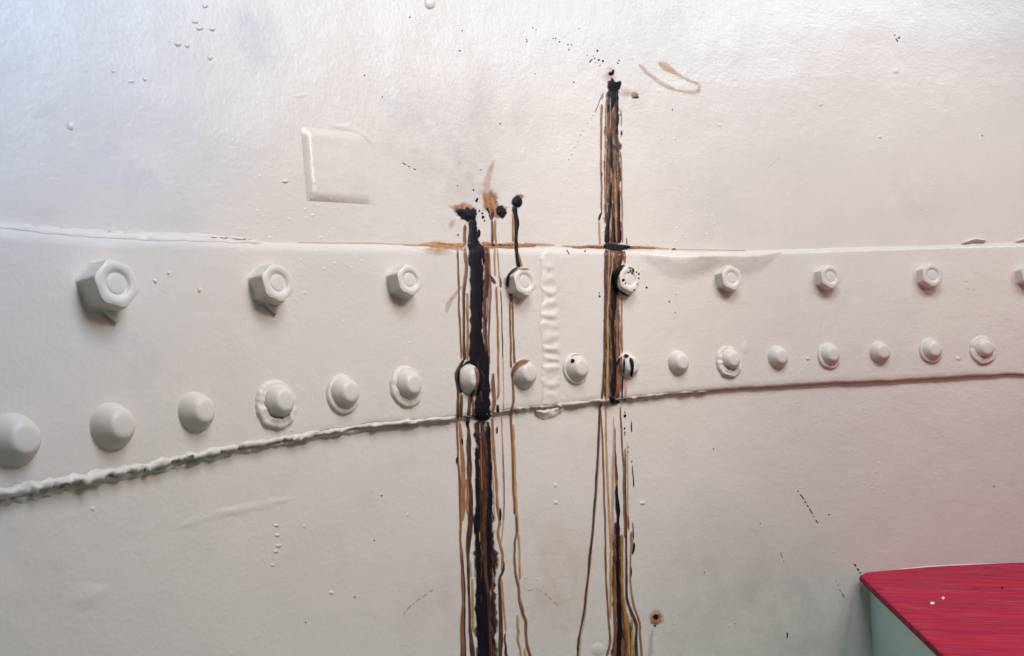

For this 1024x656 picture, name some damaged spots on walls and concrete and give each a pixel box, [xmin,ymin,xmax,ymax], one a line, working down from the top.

rust [409,70,676,656]